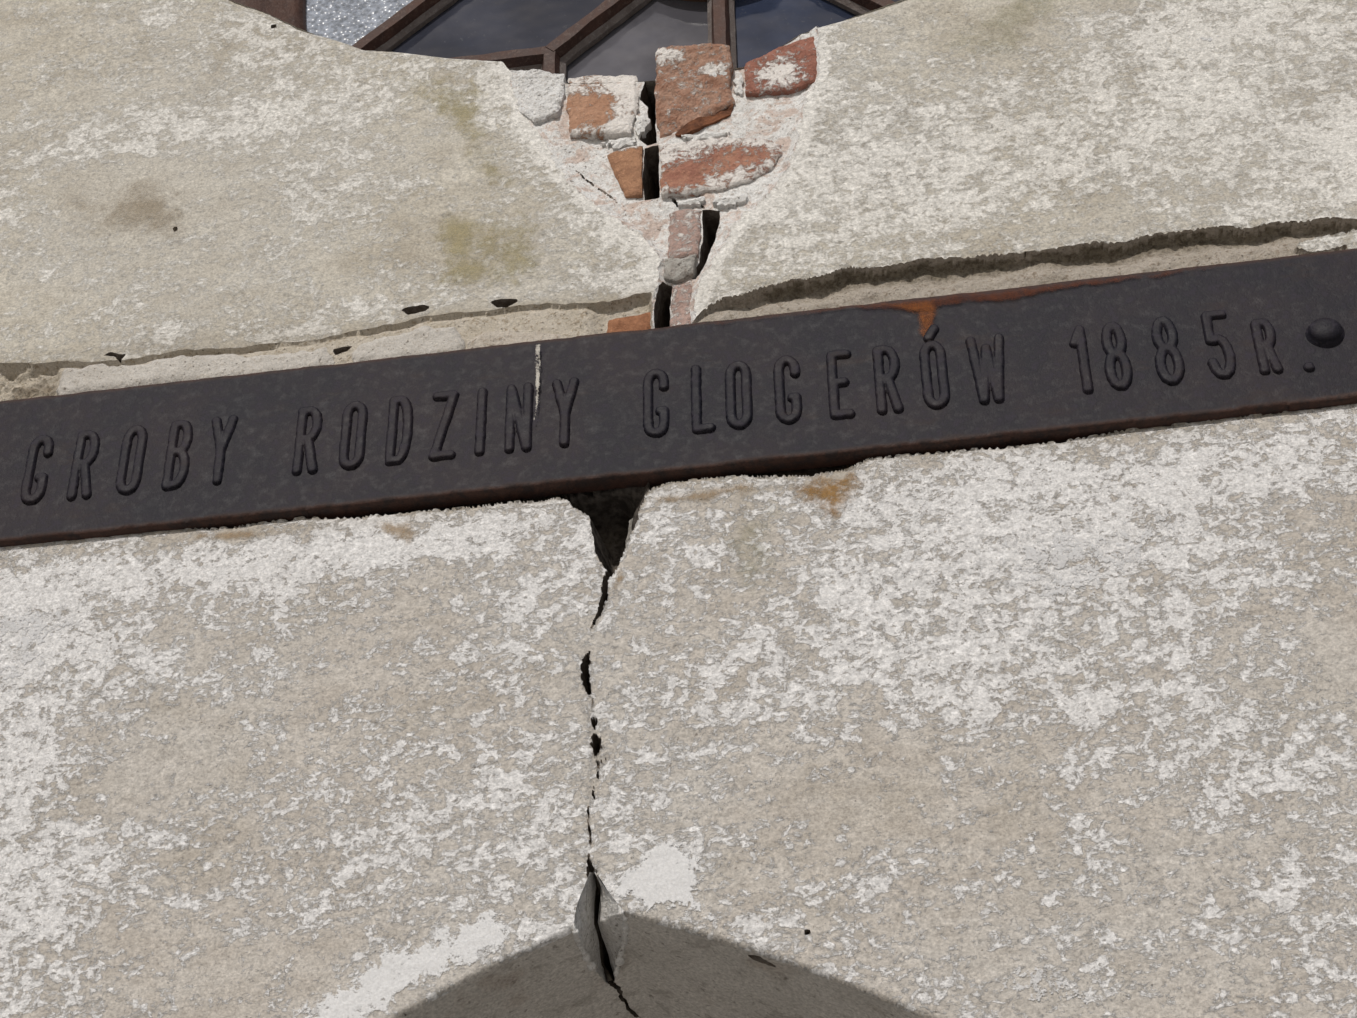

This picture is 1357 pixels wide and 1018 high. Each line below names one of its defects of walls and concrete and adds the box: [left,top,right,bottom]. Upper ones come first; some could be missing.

crack [569,82,720,328]
flaking render [0,26,1357,401]
corrosion [859,277,1131,333]
crack [580,571,610,898]
crack [603,963,639,1018]